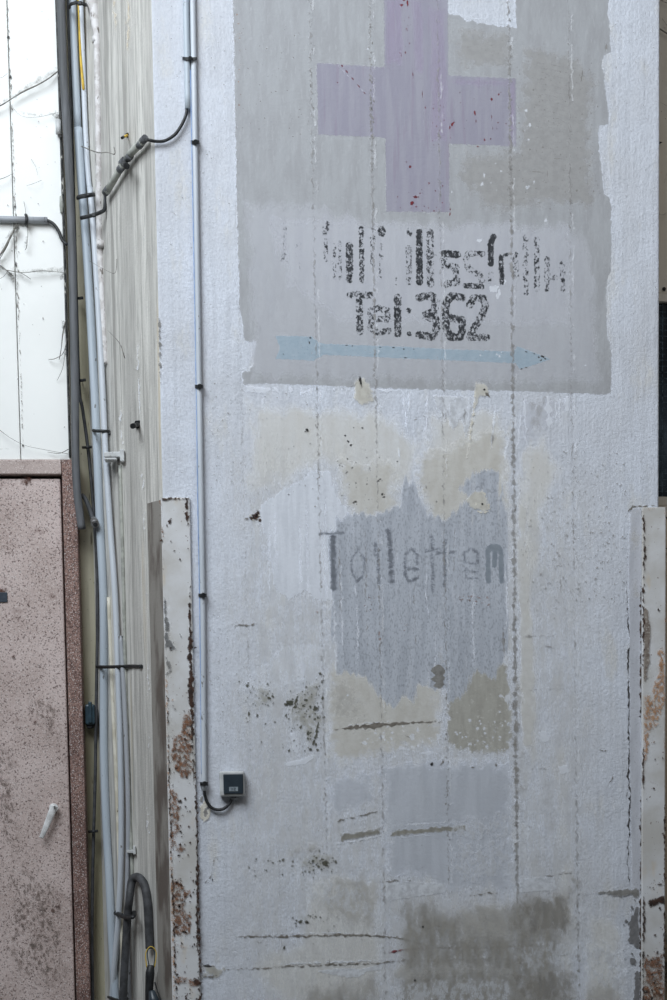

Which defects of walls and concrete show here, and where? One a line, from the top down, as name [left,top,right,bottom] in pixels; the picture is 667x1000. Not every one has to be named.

peeling [219,0,620,439]
flaking render [338,457,398,516]
flaking render [417,432,529,522]
corrosion [164,586,202,1000]
flaking render [321,663,518,896]
corrosion [639,511,667,846]
corrosion [639,807,667,1000]